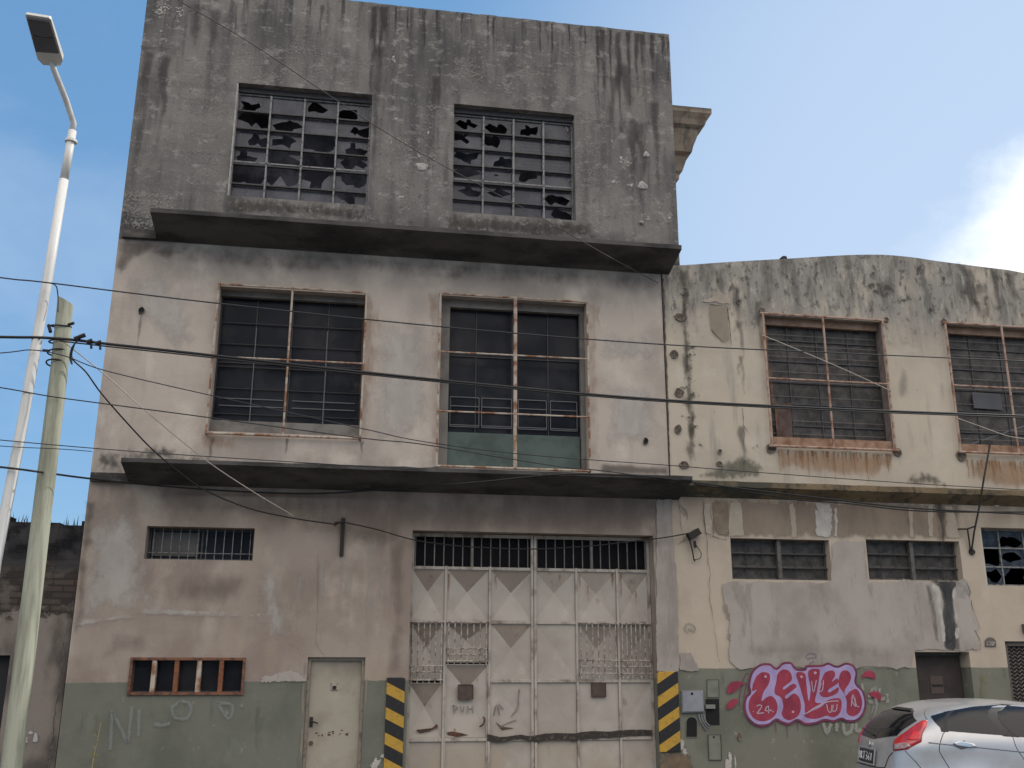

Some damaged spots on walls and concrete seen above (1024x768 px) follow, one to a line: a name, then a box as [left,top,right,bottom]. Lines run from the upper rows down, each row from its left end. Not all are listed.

water stain [372,7,408,46]
water stain [585,30,669,86]
water stain [703,291,731,342]
water stain [680,334,702,452]
corrosion [787,450,891,468]
peeling [728,501,744,536]
peeling [789,503,797,538]
peeling [815,502,838,537]
peeling [928,505,960,538]
water stain [722,540,979,670]
peeling [931,584,959,642]